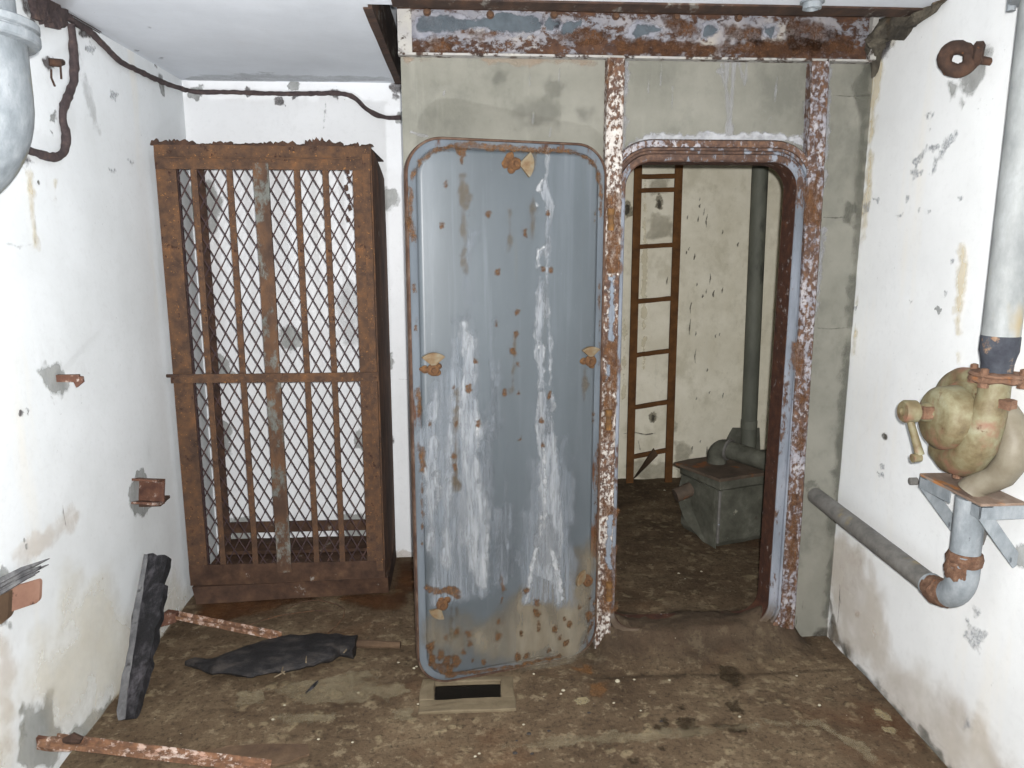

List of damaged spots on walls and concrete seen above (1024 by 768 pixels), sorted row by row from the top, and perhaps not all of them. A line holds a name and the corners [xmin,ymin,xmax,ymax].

rust [413,39,451,53]
rust [558,18,855,84]
spalling [864,0,947,78]
damp [630,62,803,146]
rust [605,193,623,274]
rust [802,174,821,226]
rust [601,337,621,441]
rust [791,342,804,373]
rust [797,421,806,453]
rust [787,494,799,571]